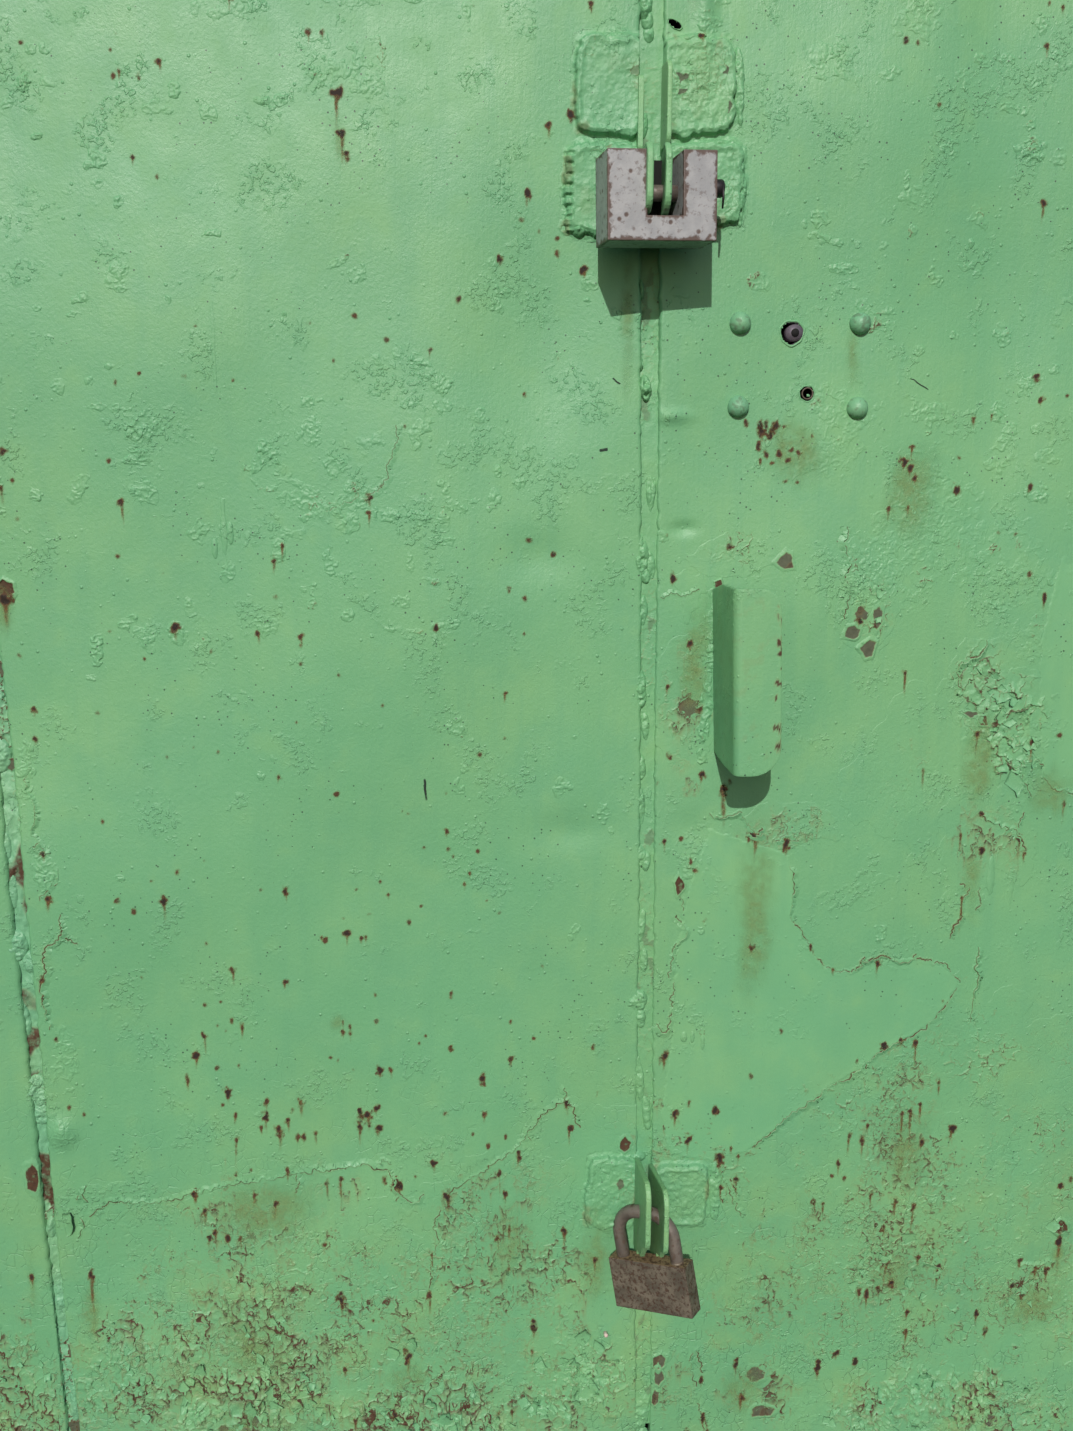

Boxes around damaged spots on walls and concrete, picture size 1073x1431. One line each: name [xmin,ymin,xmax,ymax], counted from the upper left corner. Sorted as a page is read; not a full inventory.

rust [330,86,343,110]
rust [744,419,801,465]
peeling [836,536,907,662]
crack [982,748,1073,852]
peeling [718,801,841,852]
crack [708,809,990,1148]
rust [260,1098,317,1141]
rust [357,1105,383,1136]
crack [74,1084,586,1291]
peeling [0,970,1073,1431]
crack [719,1166,746,1217]